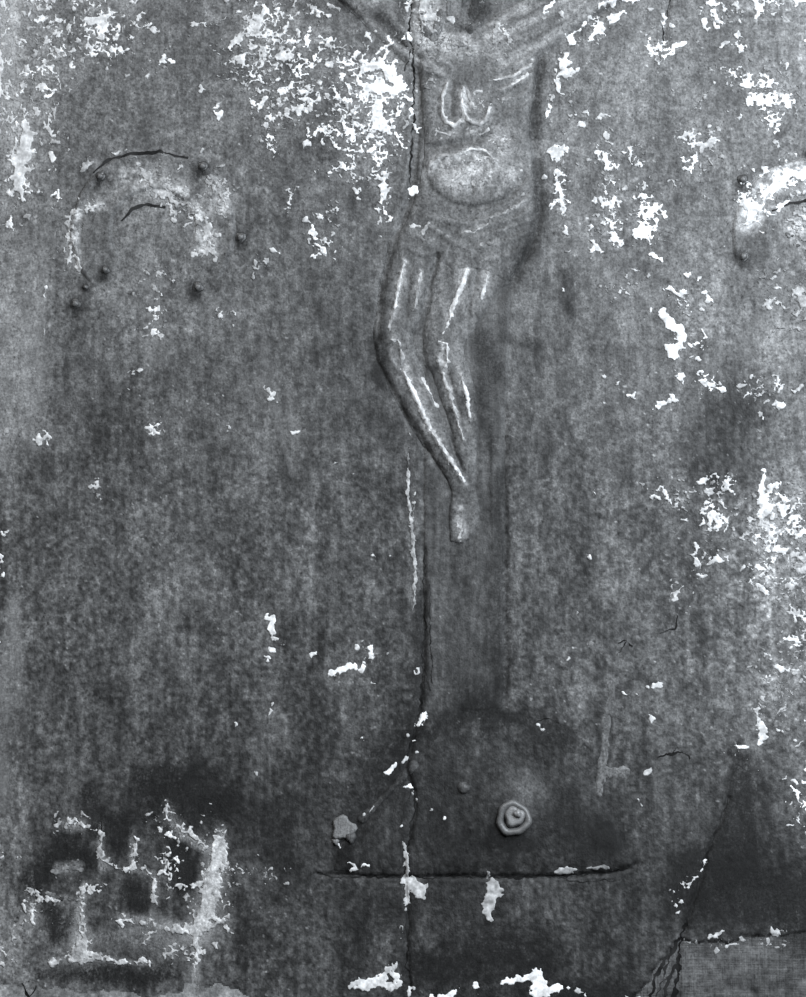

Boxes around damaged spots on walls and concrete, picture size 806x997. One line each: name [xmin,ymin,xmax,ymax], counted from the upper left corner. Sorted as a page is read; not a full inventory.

peeling [0,0,160,275]
peeling [111,149,240,263]
peeling [302,200,343,260]
peeling [188,0,525,246]
crack [404,3,416,185]
peeling [541,0,703,263]
peeling [667,0,806,338]
peeling [638,469,806,756]
peeling [0,799,291,968]
peeling [348,961,415,997]
peeling [500,968,586,997]
crack [649,799,728,997]